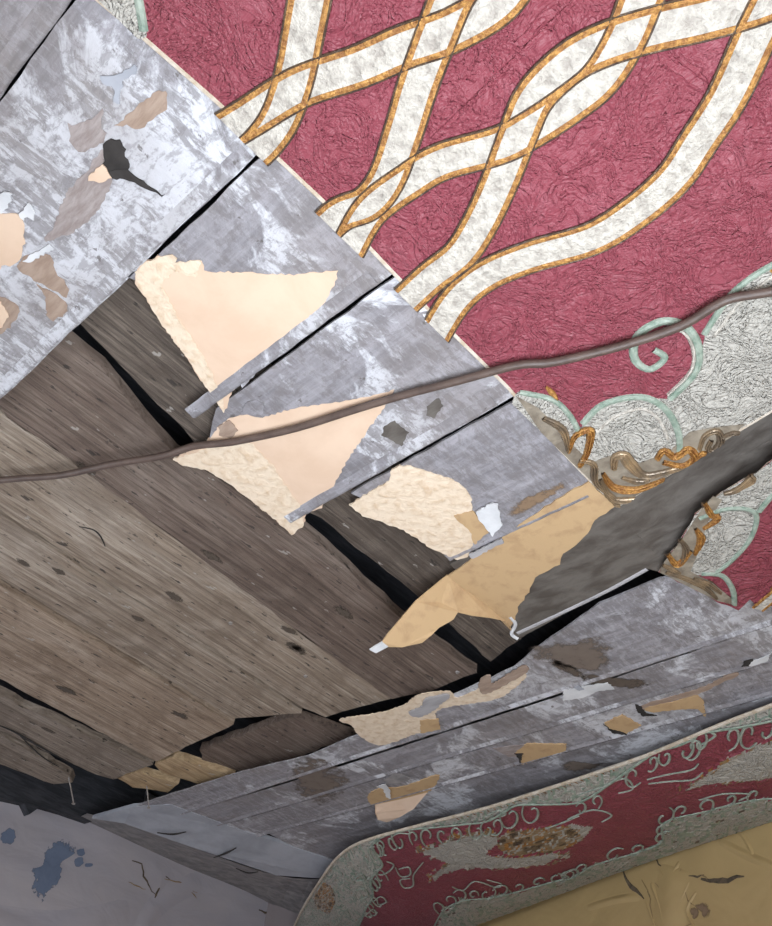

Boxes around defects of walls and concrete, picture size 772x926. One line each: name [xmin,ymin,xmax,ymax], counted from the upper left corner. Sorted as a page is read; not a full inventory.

peeling [0,90,167,321]
peeling [0,297,20,334]
peeling [241,400,265,415]
peeling [454,503,504,559]
peeling [369,641,388,653]
peeling [408,694,450,733]
peeling [478,665,529,694]
peeling [562,682,614,701]
peeling [644,695,706,717]
crack [0,725,72,767]
crack [129,860,197,898]
crack [623,859,744,926]